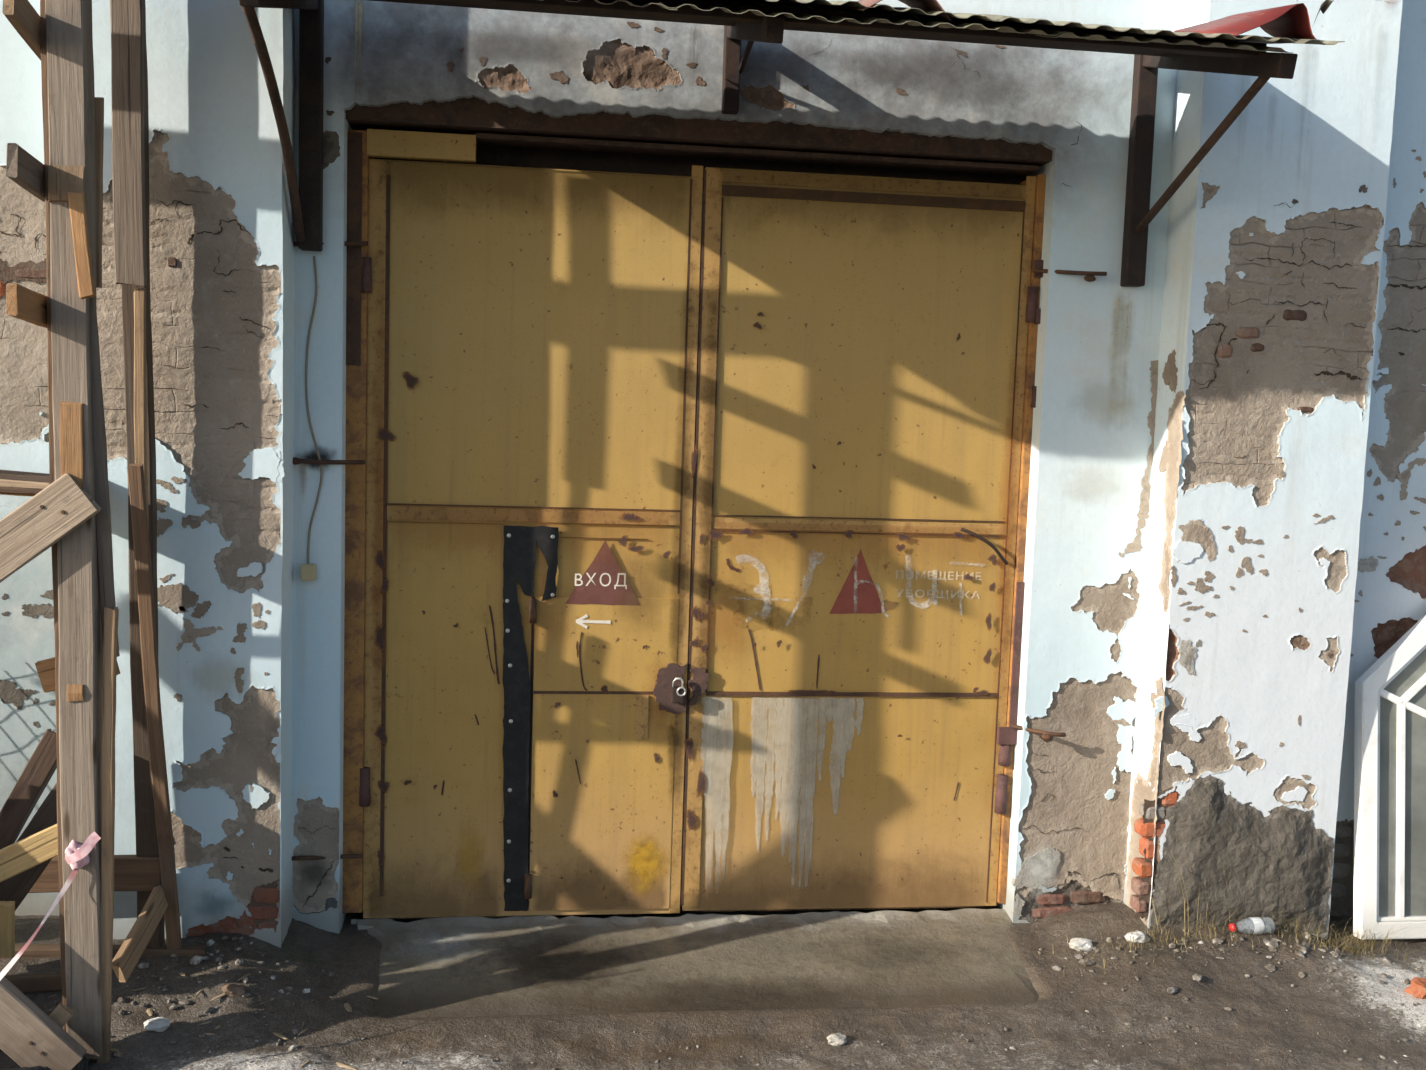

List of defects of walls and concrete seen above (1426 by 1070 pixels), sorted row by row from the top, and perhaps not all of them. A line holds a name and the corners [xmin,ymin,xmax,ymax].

peeling [447,48,534,96]
peeling [549,21,705,92]
peeling [740,82,809,113]
peeling [0,163,49,447]
peeling [96,177,127,463]
peeling [149,127,340,937]
peeling [1010,149,1426,925]